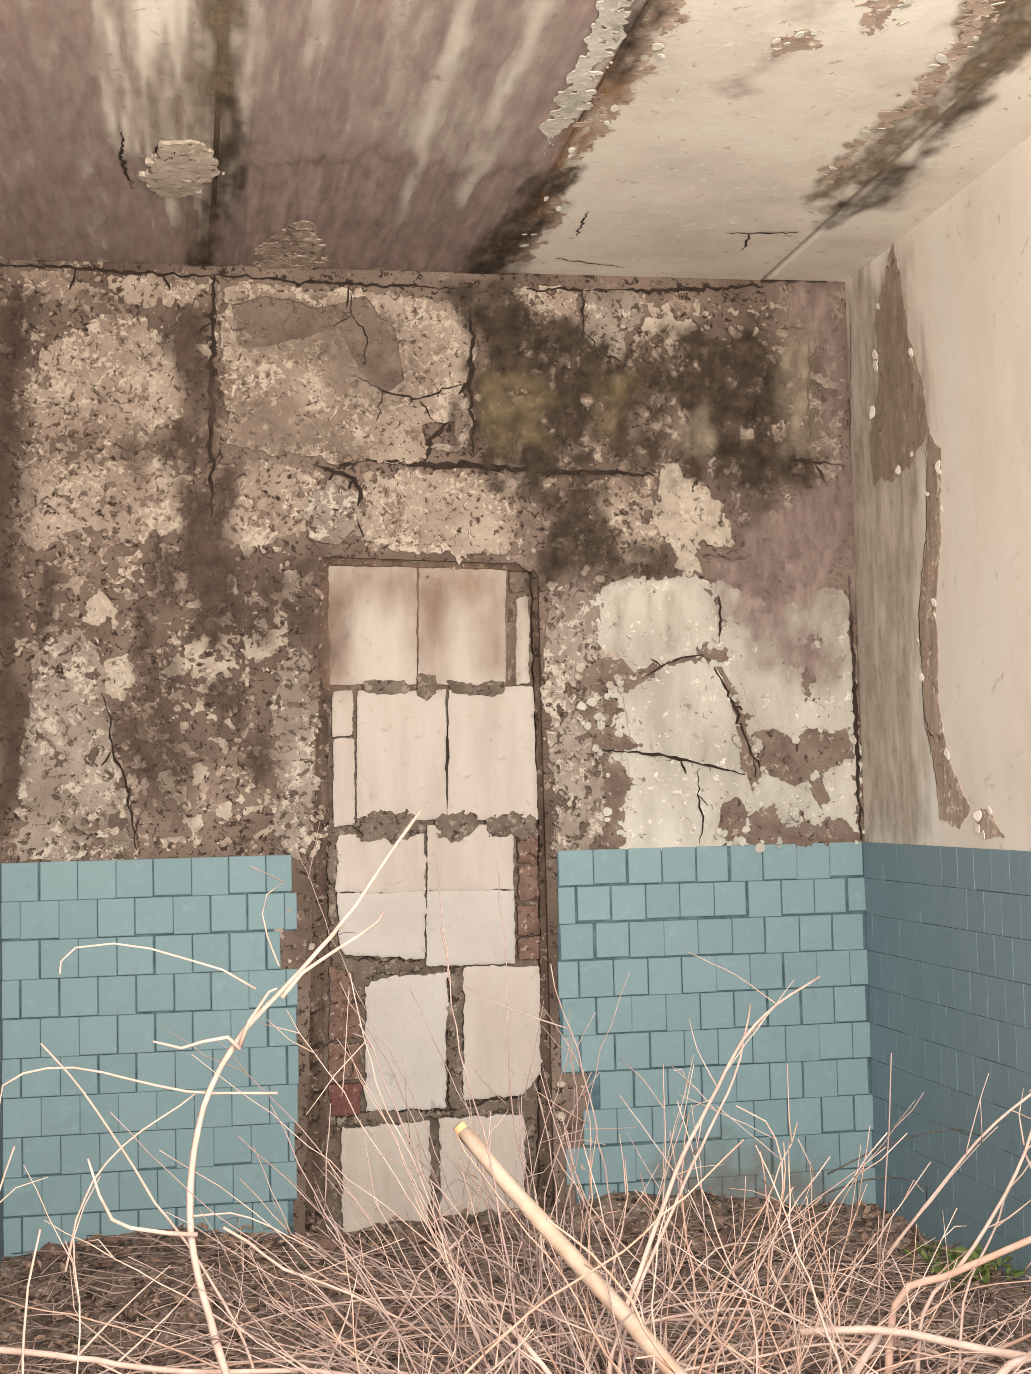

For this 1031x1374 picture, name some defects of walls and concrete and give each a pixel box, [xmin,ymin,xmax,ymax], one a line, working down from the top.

crack [119,132,158,193]
peeling [505,0,691,264]
peeling [762,29,823,60]
damp [812,0,1031,228]
crack [0,264,653,537]
damp [0,0,916,758]
crack [527,213,840,361]
crack [766,323,851,483]
peeling [869,244,1005,840]
damp [0,645,20,807]
crack [601,595,764,840]
crack [848,576,863,841]